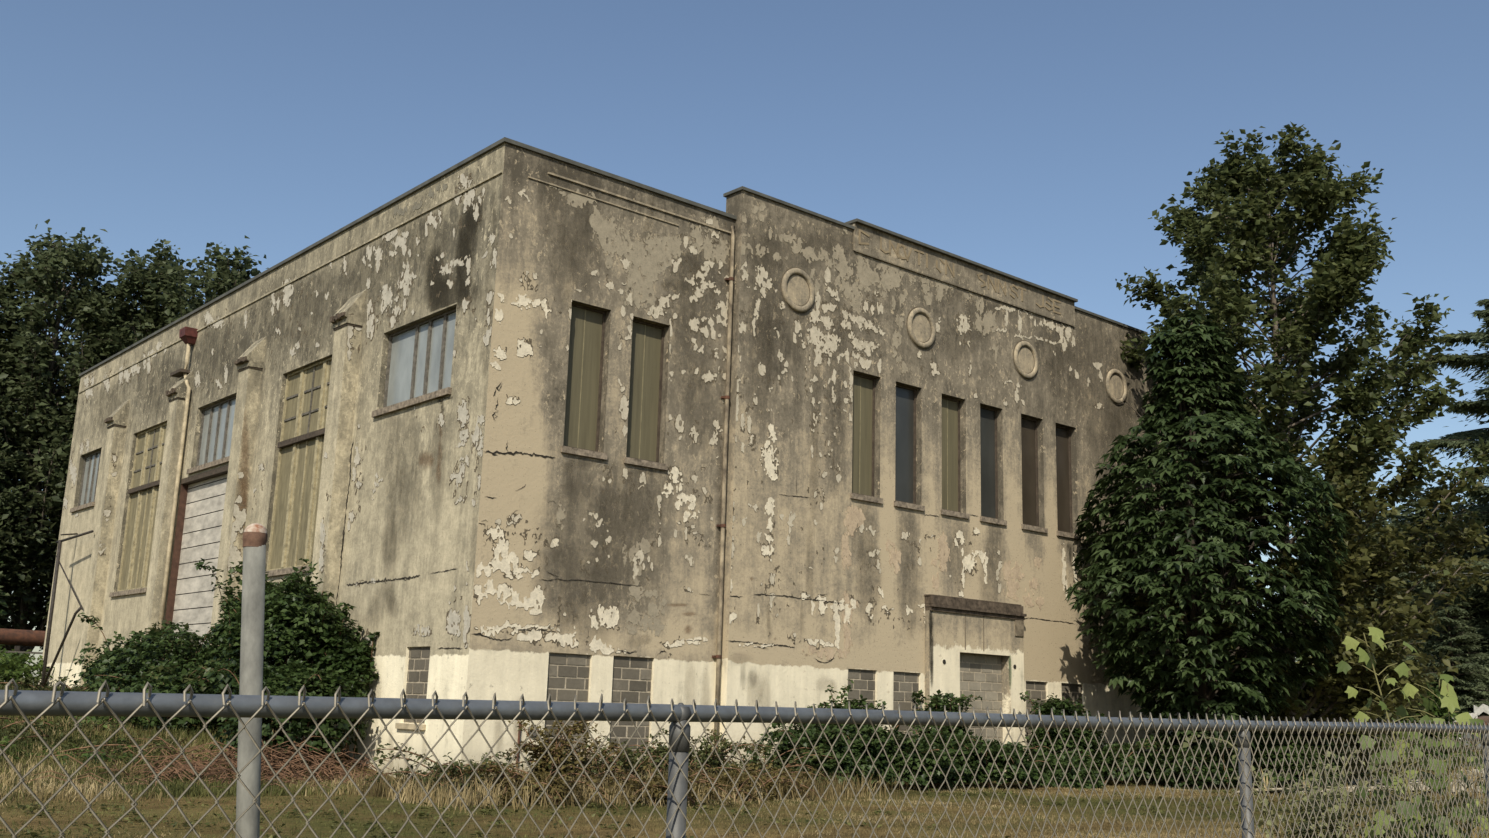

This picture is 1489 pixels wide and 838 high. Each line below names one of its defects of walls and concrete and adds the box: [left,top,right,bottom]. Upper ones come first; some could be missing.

leakage [427,202,482,311]
peeling [330,173,582,370]
peeling [347,424,383,532]
crack [483,383,555,546]
peeling [413,183,1104,658]